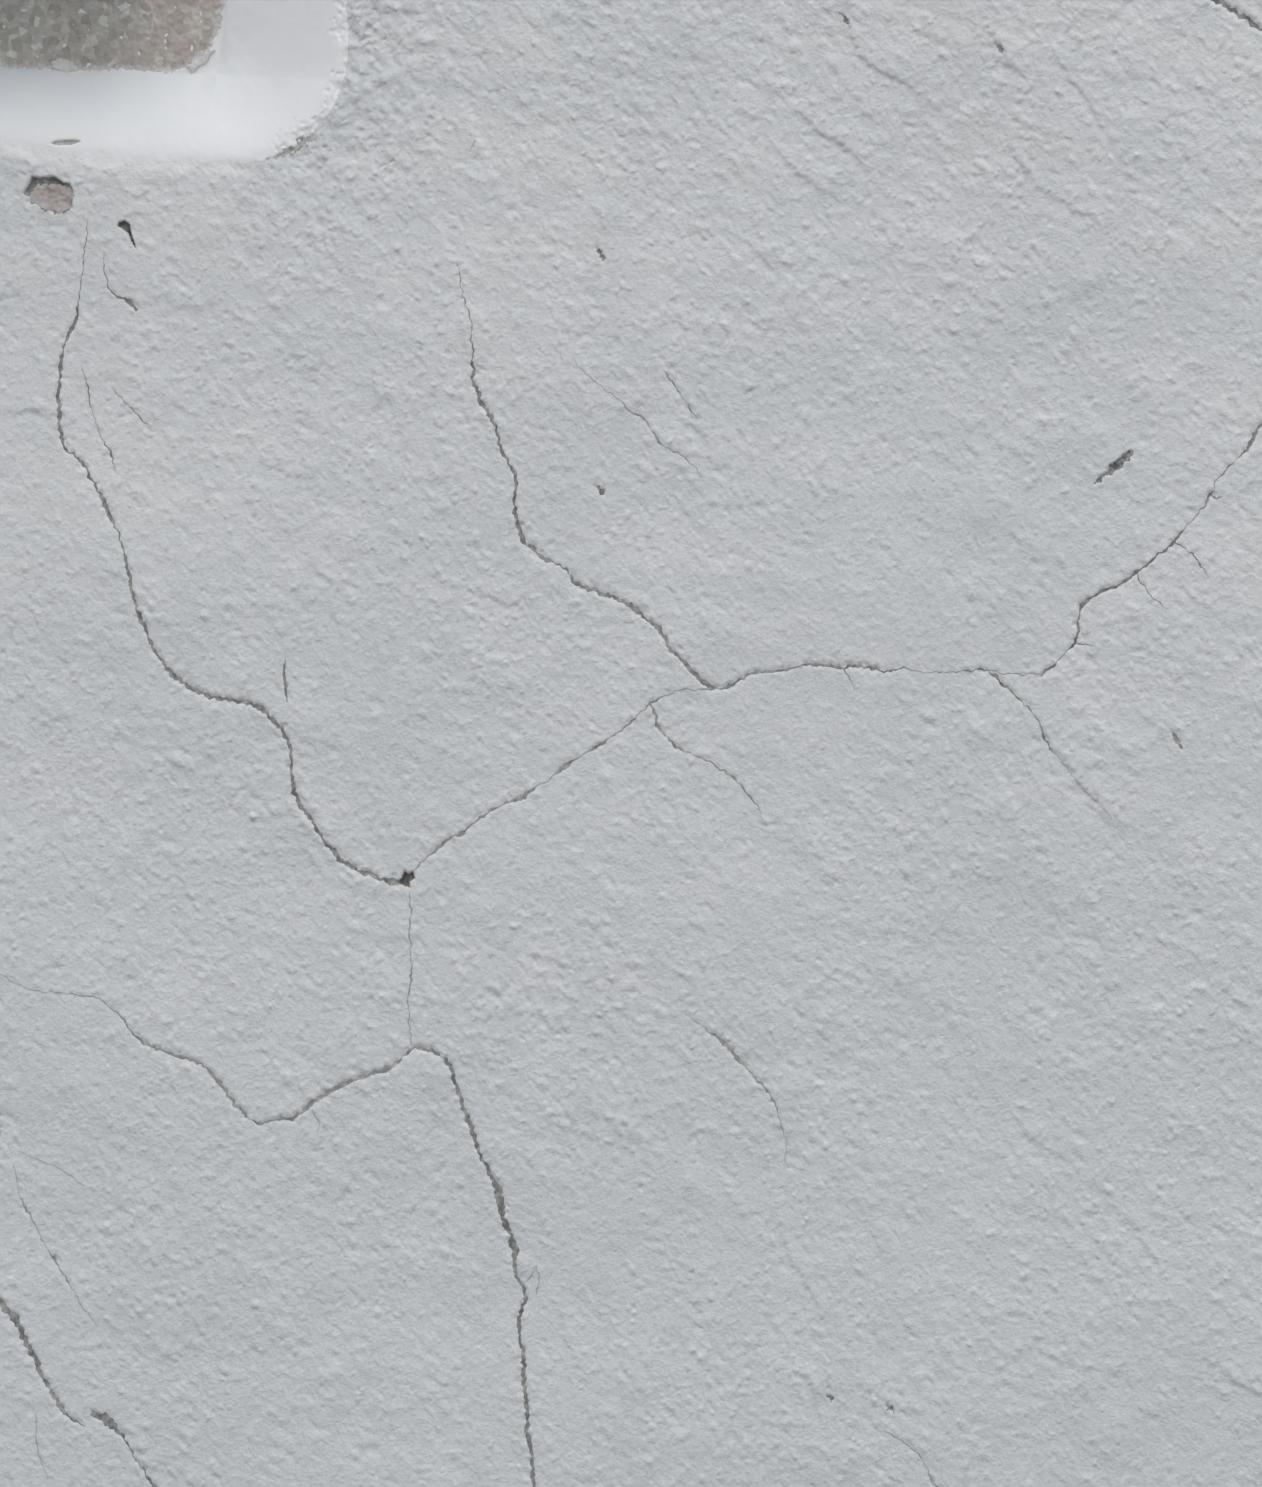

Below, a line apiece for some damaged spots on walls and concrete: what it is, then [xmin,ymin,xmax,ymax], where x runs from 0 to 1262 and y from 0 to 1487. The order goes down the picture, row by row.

flaking render [0,0,227,74]
crack [1211,0,1262,31]
flaking render [23,176,75,215]
crack [915,423,1262,793]
crack [0,222,909,1487]
crack [883,1430,939,1487]